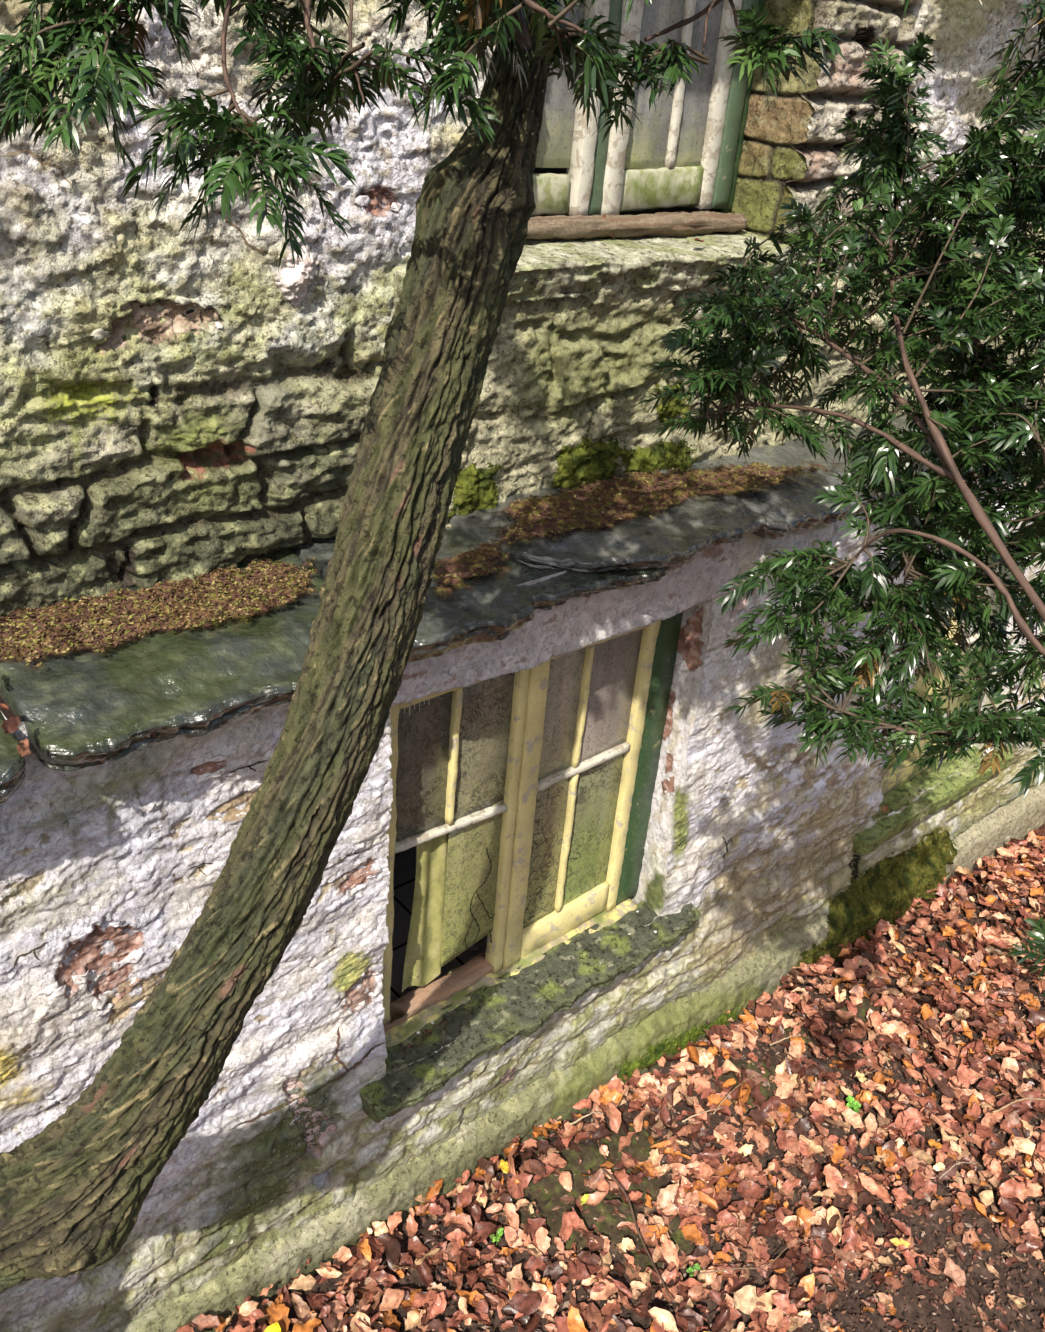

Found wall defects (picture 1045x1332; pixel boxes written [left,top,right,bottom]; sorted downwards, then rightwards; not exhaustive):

spalling [355,185,403,216]
spalling [90,296,224,354]
peeling [336,858,379,898]
spalling [36,920,168,1025]
water stain [198,1069,339,1266]